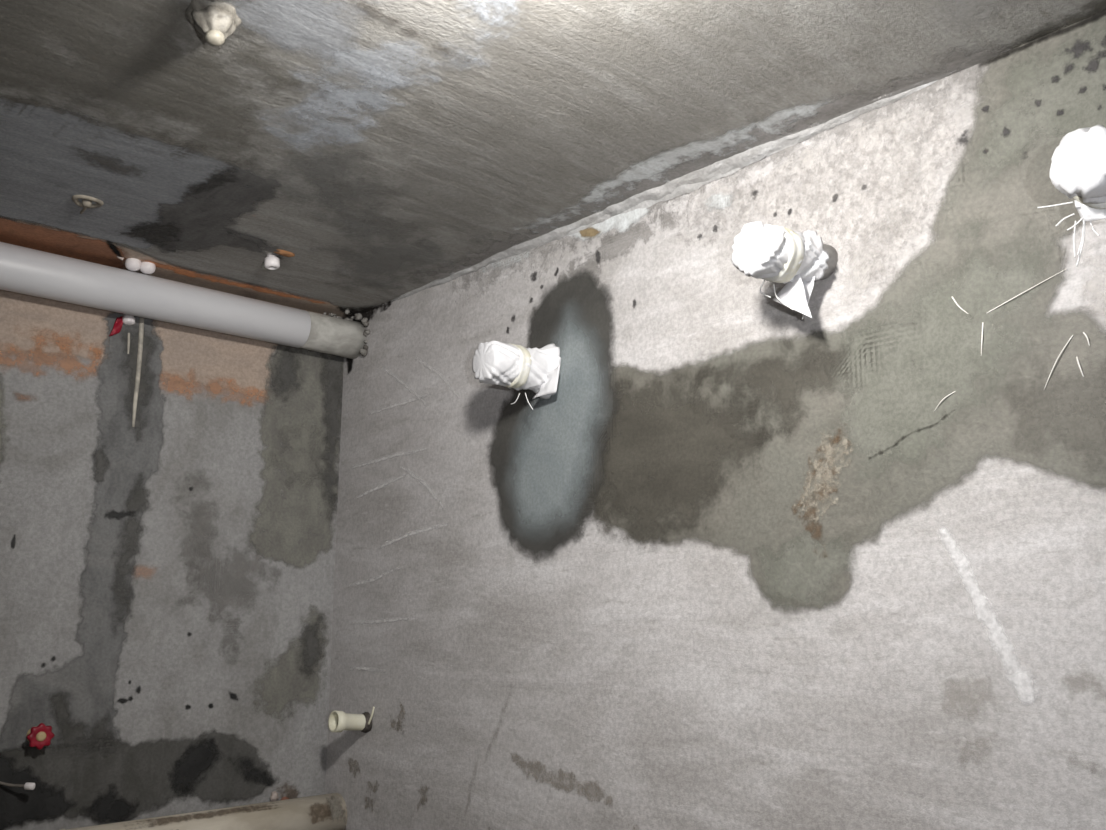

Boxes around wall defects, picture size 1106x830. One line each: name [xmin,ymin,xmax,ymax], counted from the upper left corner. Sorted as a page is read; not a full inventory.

leakage [0,0,255,147]
leakage [235,0,409,85]
leakage [122,160,282,259]
leakage [268,119,444,288]
corrosion [0,290,114,376]
corrosion [0,218,351,318]
corrosion [152,320,278,405]
leakage [490,15,1106,610]
leakage [183,344,344,650]
leakage [0,312,275,830]
leakage [254,606,327,715]